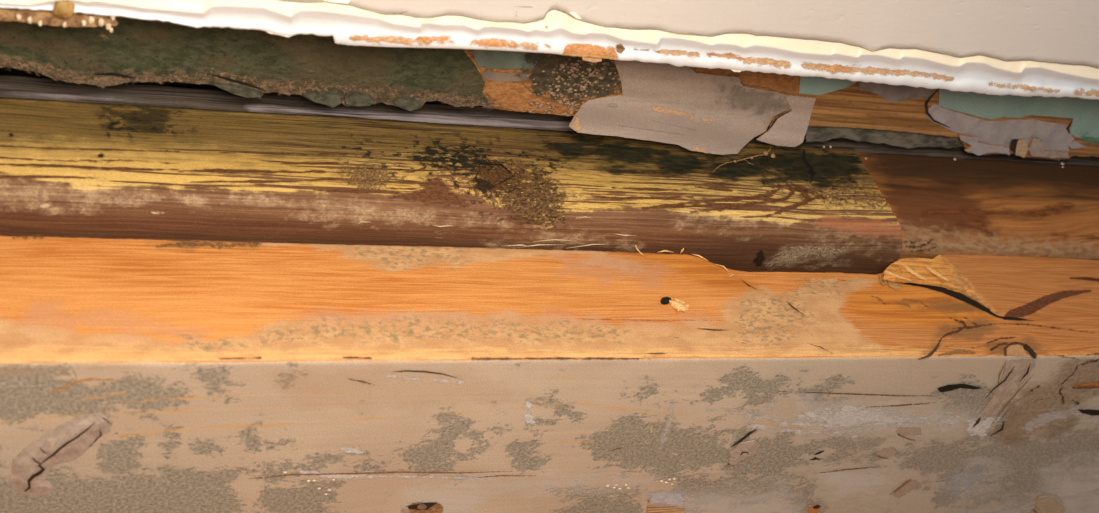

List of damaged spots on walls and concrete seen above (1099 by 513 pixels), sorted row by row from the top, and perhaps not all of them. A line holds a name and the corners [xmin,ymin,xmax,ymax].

spalling [0,67,50,78]
spalling [127,81,223,90]
damp [0,8,490,111]
damp [517,52,622,102]
peeling [464,49,1099,158]
crack [0,145,426,193]
damp [406,145,496,172]
crack [594,186,733,208]
crack [901,282,1099,410]
crack [24,416,111,492]